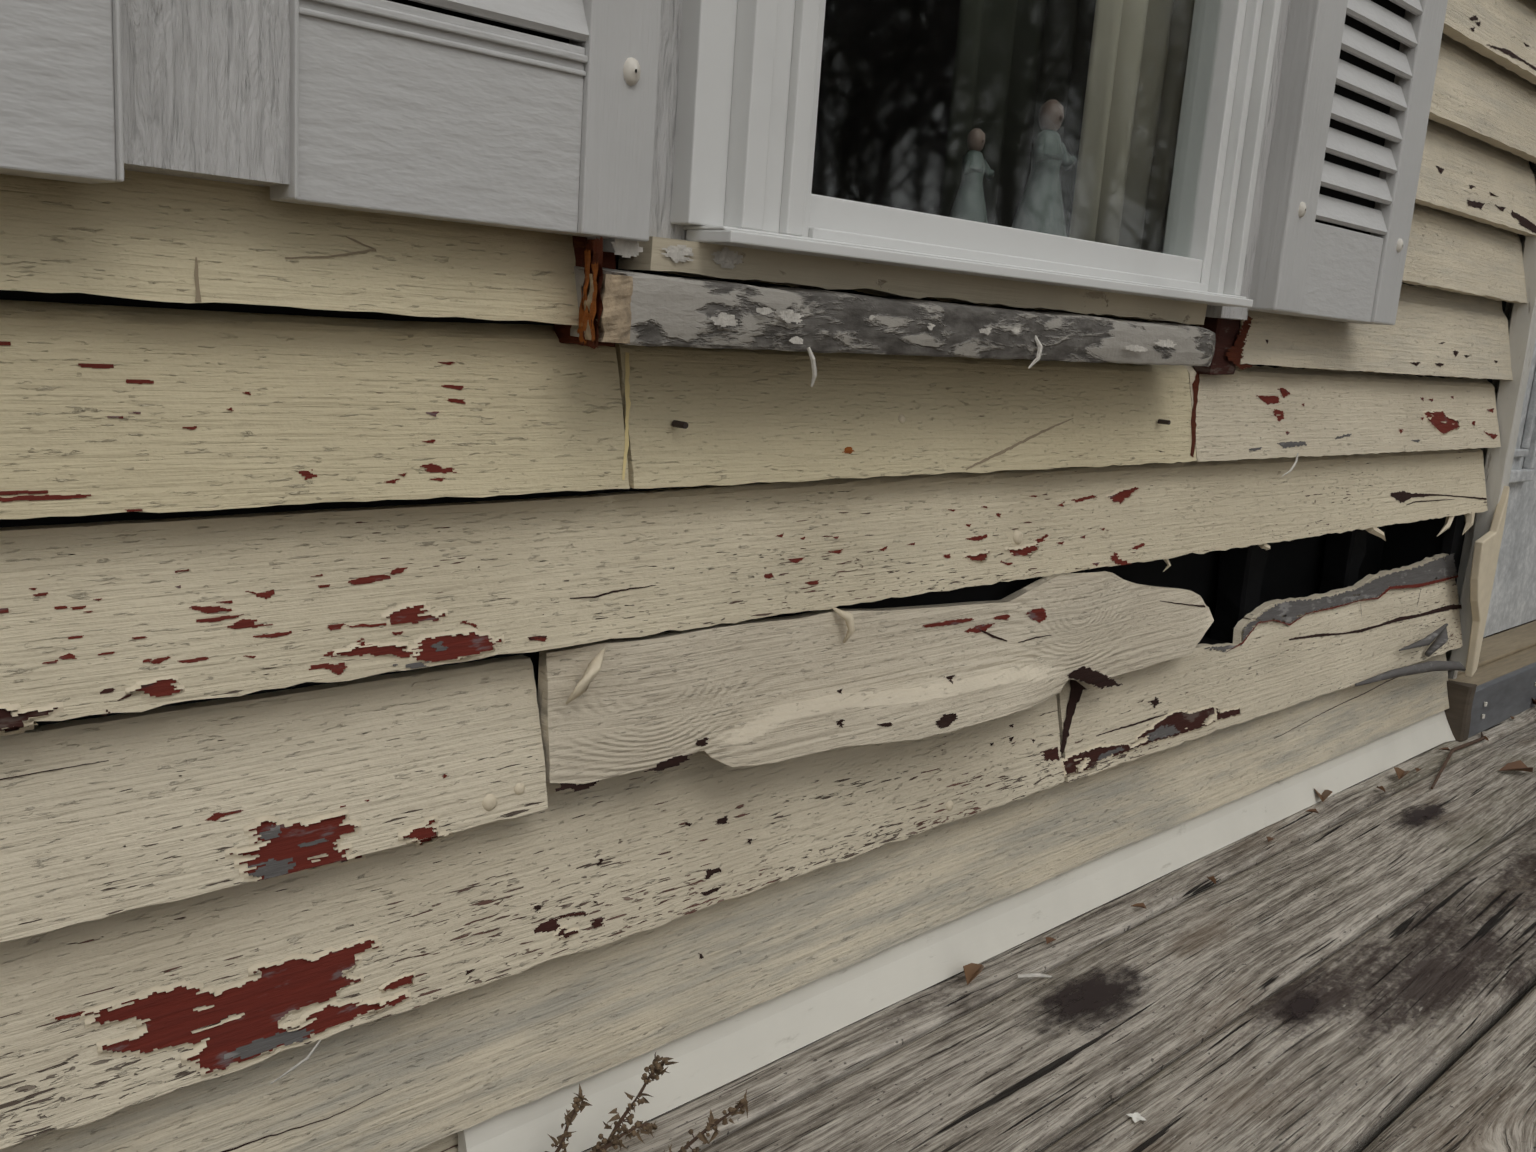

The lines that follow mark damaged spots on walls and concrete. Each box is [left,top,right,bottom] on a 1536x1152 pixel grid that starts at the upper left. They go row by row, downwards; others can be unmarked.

peeling [611,239,743,269]
corrosion [577,237,603,349]
peeling [709,312,738,327]
peeling [756,307,804,344]
peeling [1126,339,1177,352]
peeling [1059,484,1140,507]
peeling [944,509,1105,566]
peeling [1092,543,1145,566]
peeling [922,607,1047,633]
peeling [55,934,415,1079]